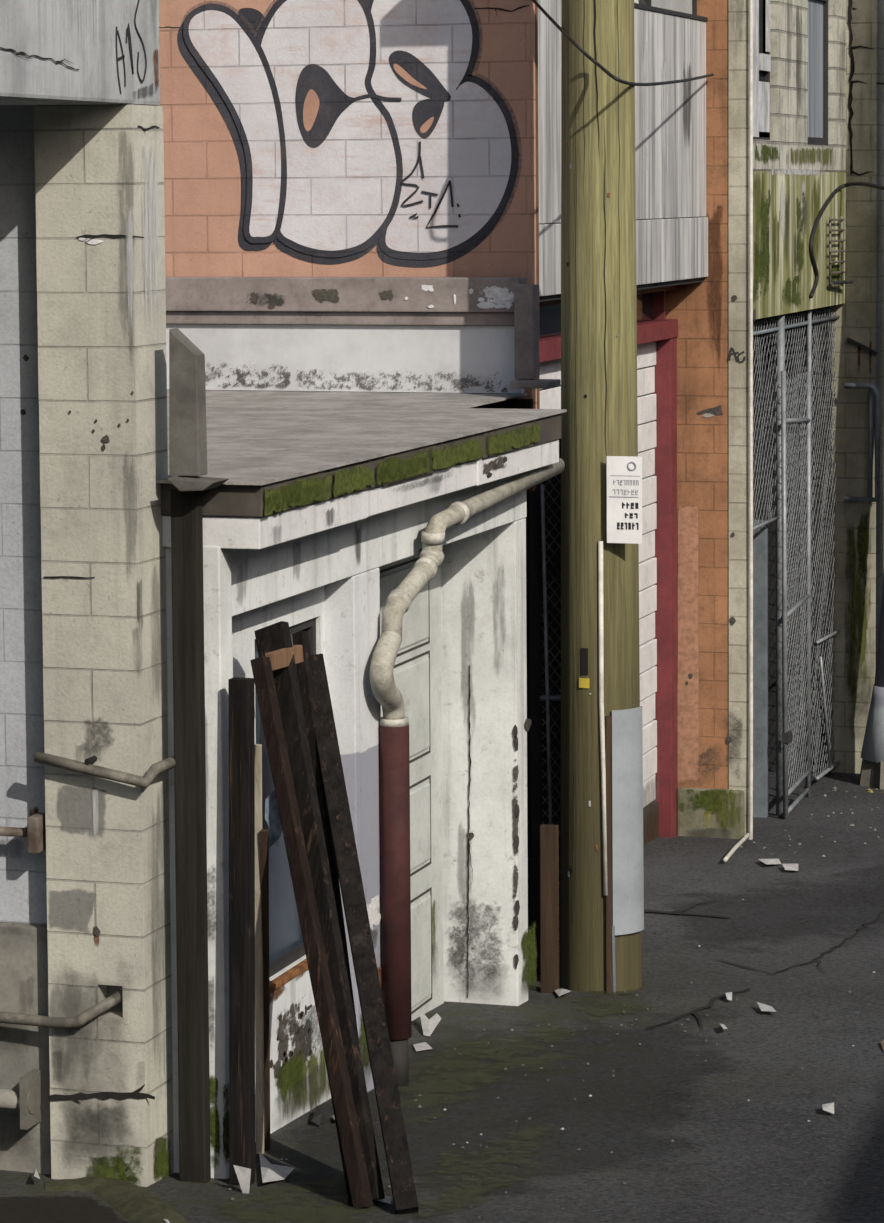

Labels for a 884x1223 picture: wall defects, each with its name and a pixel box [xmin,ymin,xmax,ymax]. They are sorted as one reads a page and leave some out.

crack [0,47,79,70]
crack [848,0,873,176]
damp [768,169,820,273]
peeling [454,286,514,309]
peeling [205,363,508,392]
peeling [512,718,531,930]
damp [450,905,498,965]
crack [48,1084,155,1104]